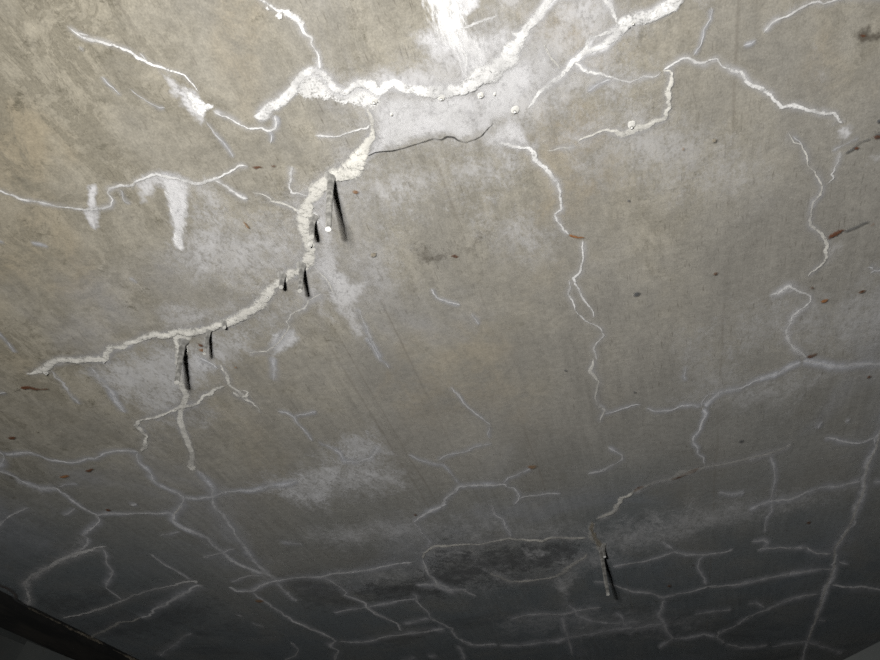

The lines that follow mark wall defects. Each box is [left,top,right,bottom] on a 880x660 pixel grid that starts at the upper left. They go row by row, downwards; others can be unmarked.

crack [71,29,197,90]
crack [0,165,274,211]
crack [215,110,278,141]
crack [261,0,321,69]
leakage [27,0,683,499]
crack [368,127,603,334]
crack [579,18,842,141]
crack [588,136,870,468]
crack [745,0,836,46]
crack [0,450,214,626]
crack [224,453,644,659]
crack [643,426,880,660]